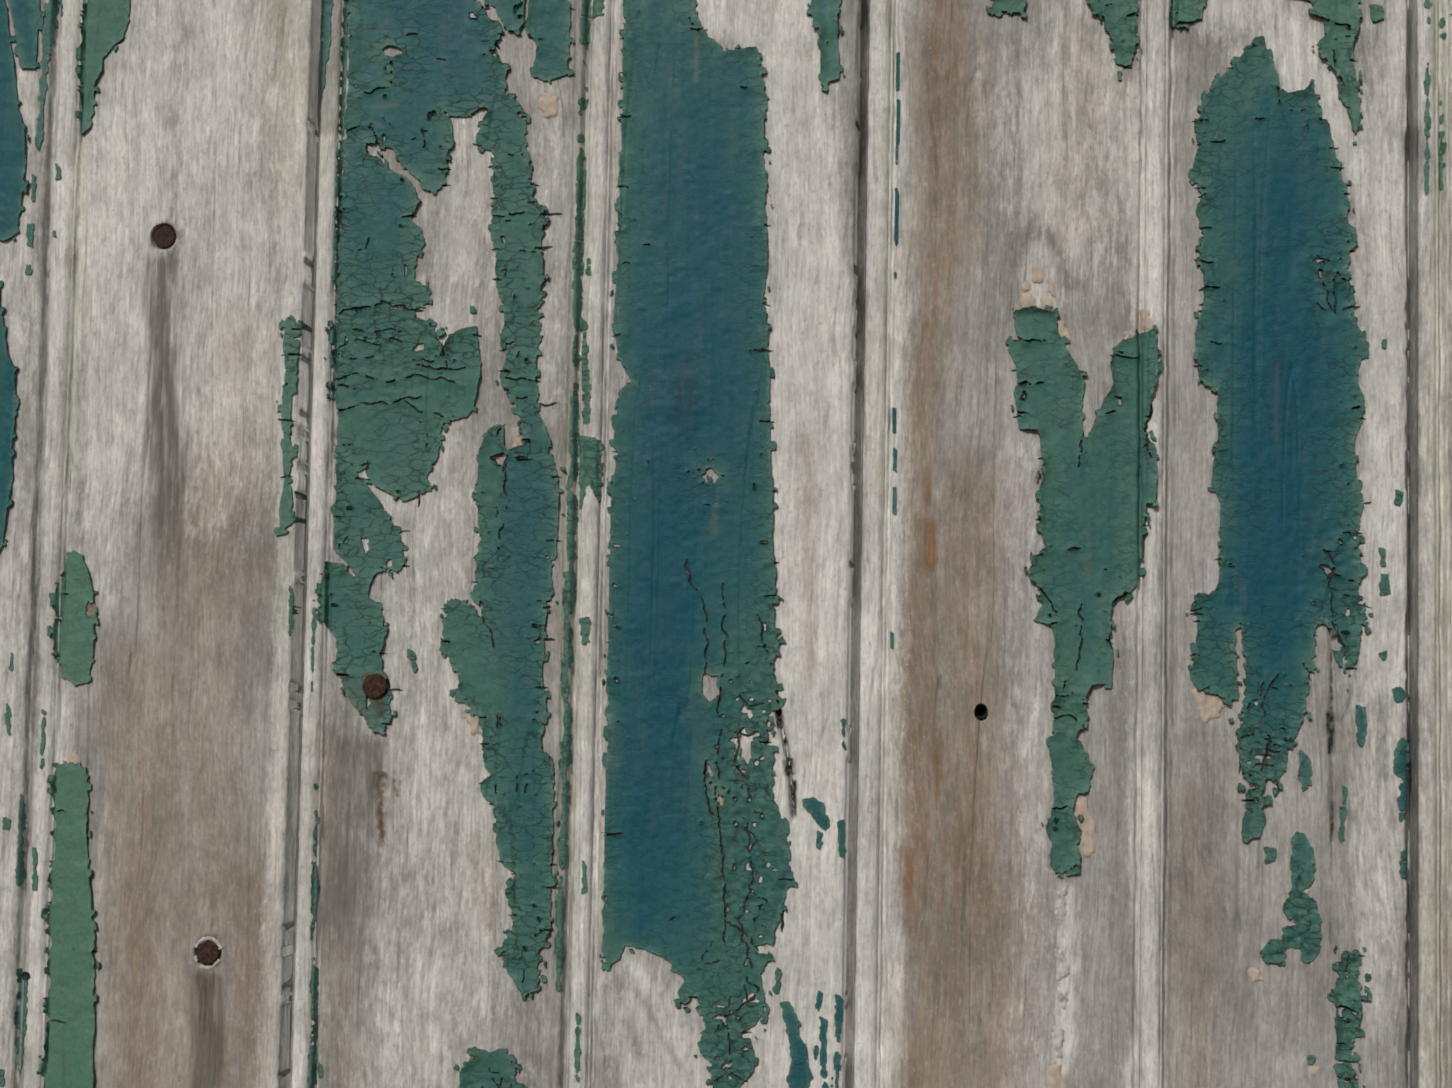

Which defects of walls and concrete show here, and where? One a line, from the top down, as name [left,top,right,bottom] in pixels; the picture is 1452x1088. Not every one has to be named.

peeling [0,0,130,275]
peeling [1086,0,1140,81]
peeling [1169,0,1207,29]
peeling [1423,62,1447,195]
peeling [0,280,20,552]
peeling [0,709,100,1088]
peeling [47,550,99,686]
peeling [274,0,847,1088]
crack [775,693,796,812]
peeling [1005,265,1164,924]
peeling [1185,0,1391,1088]
peeling [1393,737,1409,821]